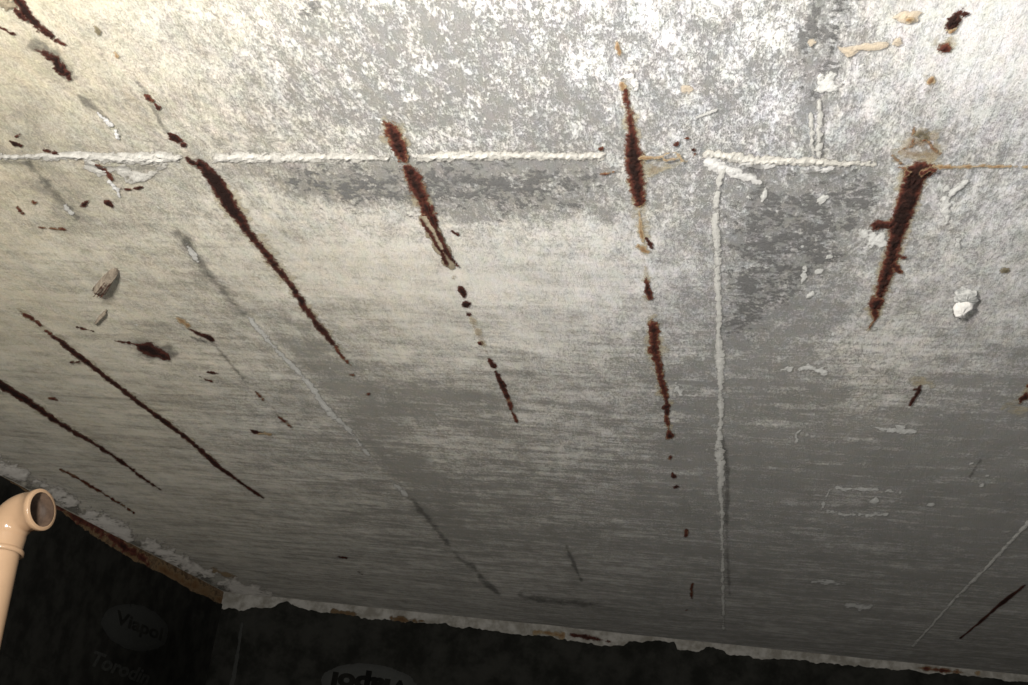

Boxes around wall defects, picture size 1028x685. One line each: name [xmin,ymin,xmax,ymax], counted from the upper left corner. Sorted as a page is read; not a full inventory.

corrosion [382,120,459,269]
corrosion [457,286,471,316]
corrosion [600,72,696,254]
corrosion [643,278,654,300]
corrosion [868,127,1028,329]
corrosion [487,358,518,423]
corrosion [647,318,674,440]
corrosion [56,505,234,604]